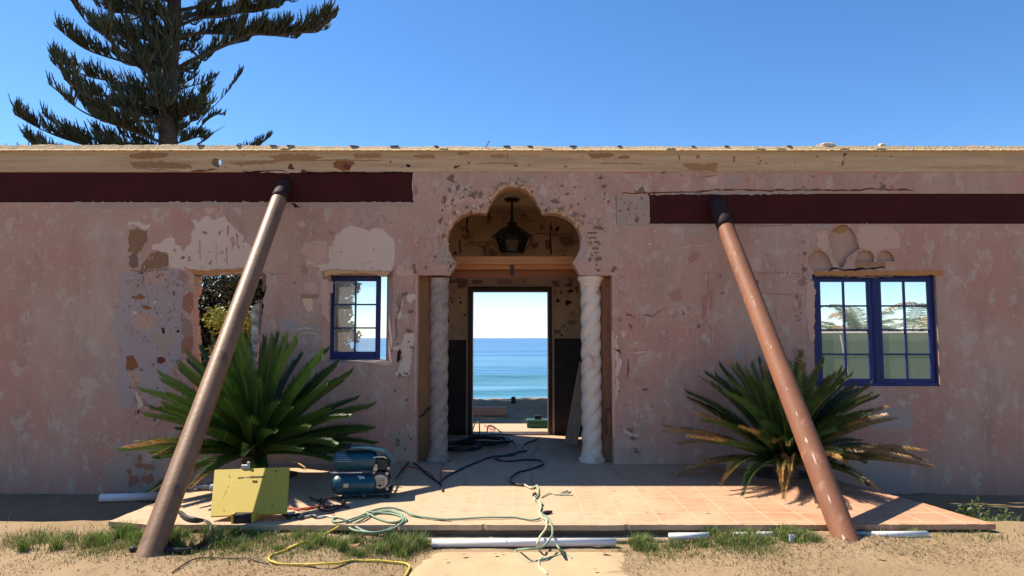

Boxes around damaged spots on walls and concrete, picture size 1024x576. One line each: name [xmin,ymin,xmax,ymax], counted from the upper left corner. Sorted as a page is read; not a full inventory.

spalling [598,176,650,226]
crack [615,172,914,224]
peeling [285,165,617,320]
peeling [857,225,900,266]
peeling [139,207,252,354]
peeling [391,329,415,377]
peeling [128,357,166,427]
peeling [105,451,163,493]